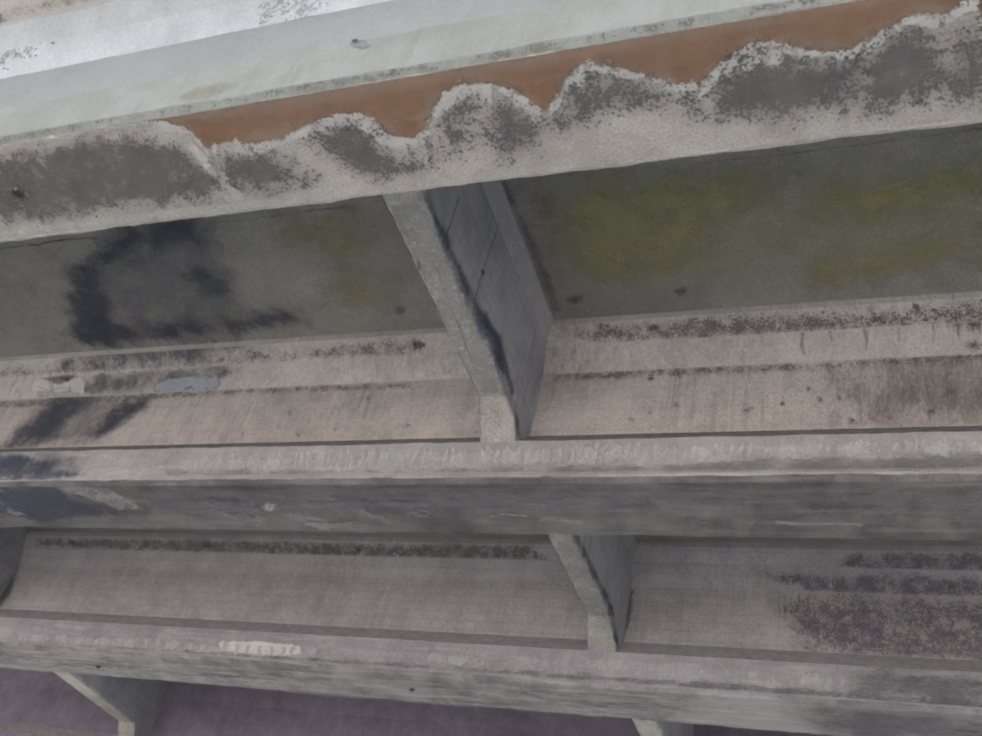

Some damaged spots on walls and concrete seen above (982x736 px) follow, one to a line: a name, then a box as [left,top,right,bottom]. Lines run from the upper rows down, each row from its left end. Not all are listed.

peeling [258,0,327,24]
spalling [350,39,369,48]
damp [0,0,982,265]
damp [1,266,425,392]
damp [95,402,145,437]
damp [0,397,137,521]
damp [163,440,982,474]
damp [147,487,903,529]
damp [36,538,547,560]
damp [573,535,619,647]
damp [768,552,982,660]
damp [0,633,982,707]